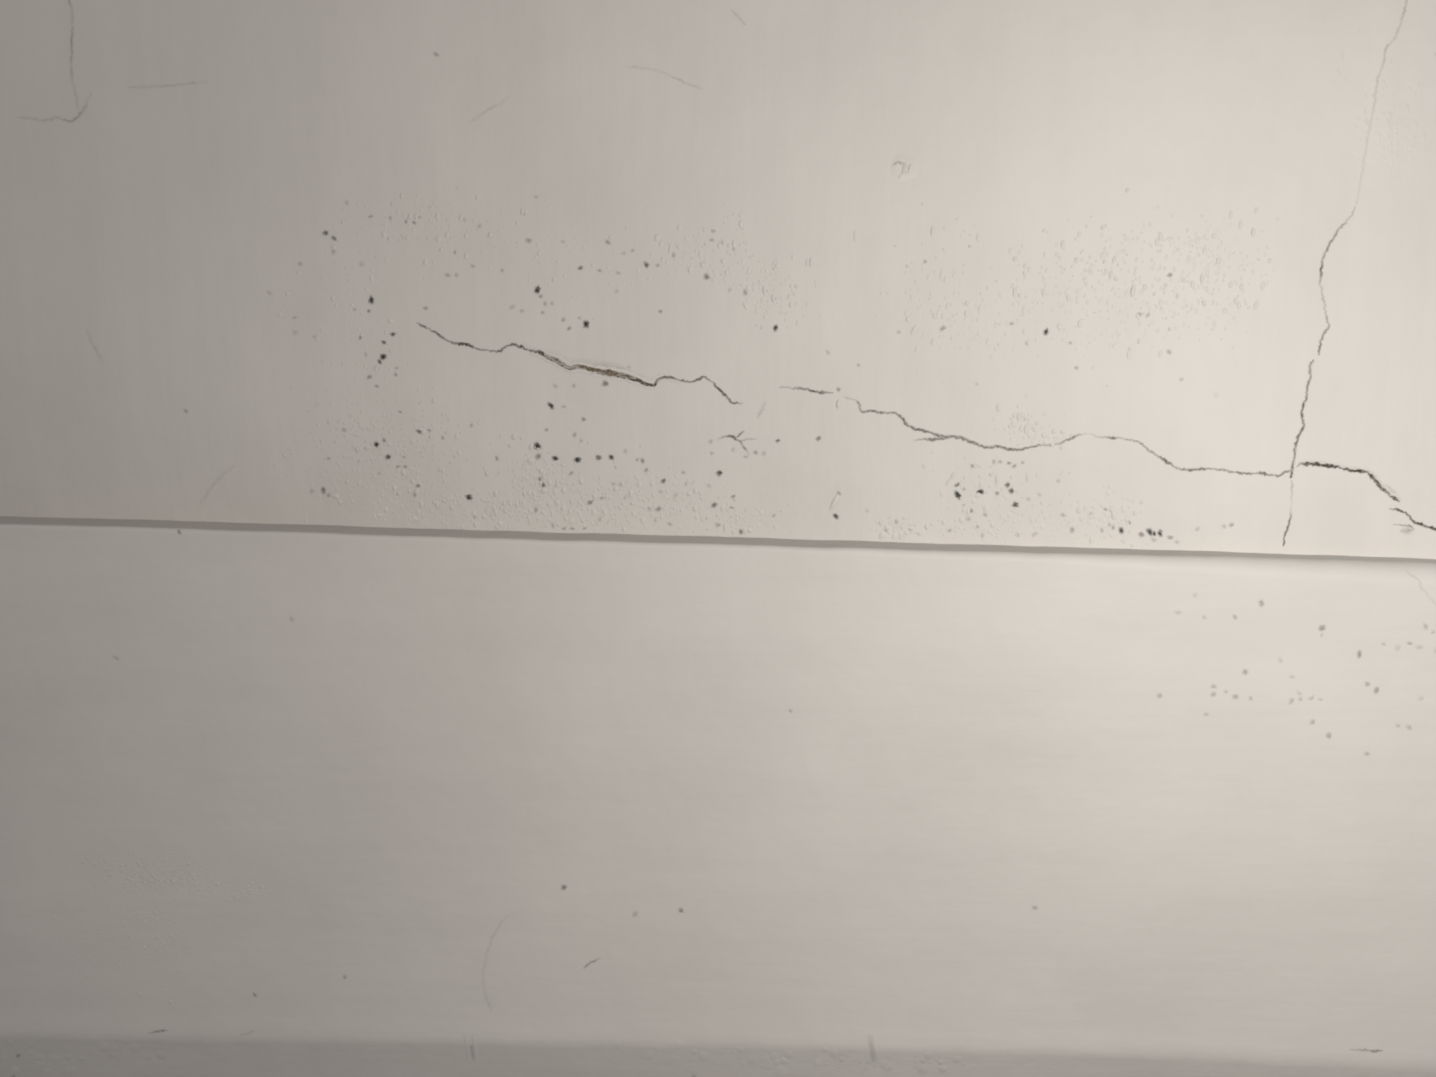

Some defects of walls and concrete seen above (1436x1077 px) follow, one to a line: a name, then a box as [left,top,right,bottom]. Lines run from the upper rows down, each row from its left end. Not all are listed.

crack [17,0,92,123]
leakage [576,239,676,294]
crack [416,0,1436,546]
leakage [509,284,590,331]
leakage [359,332,399,388]
leakage [547,383,577,410]
leakage [373,437,408,475]
leakage [533,417,688,530]
leakage [706,438,782,527]
leakage [947,459,1042,538]
leakage [1089,507,1180,544]